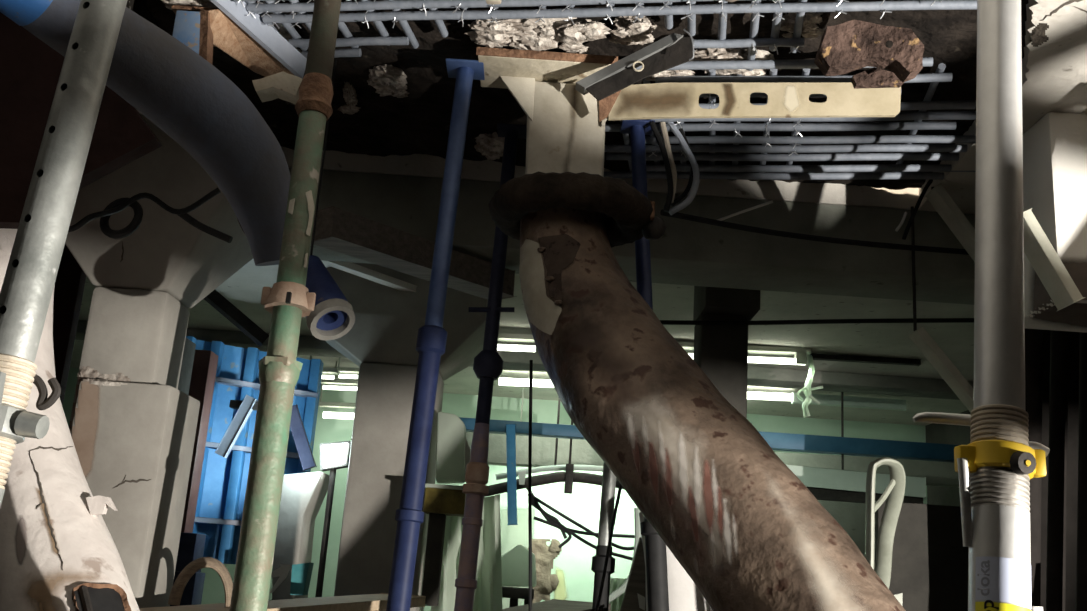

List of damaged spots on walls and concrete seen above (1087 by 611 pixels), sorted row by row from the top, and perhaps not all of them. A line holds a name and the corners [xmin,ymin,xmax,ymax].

spalling [144,0,218,36]
spalling [244,0,315,53]
corrosion [814,20,924,89]
spalling [212,47,299,150]
spalling [323,0,977,190]
crack [29,446,73,571]
crack [114,476,151,488]